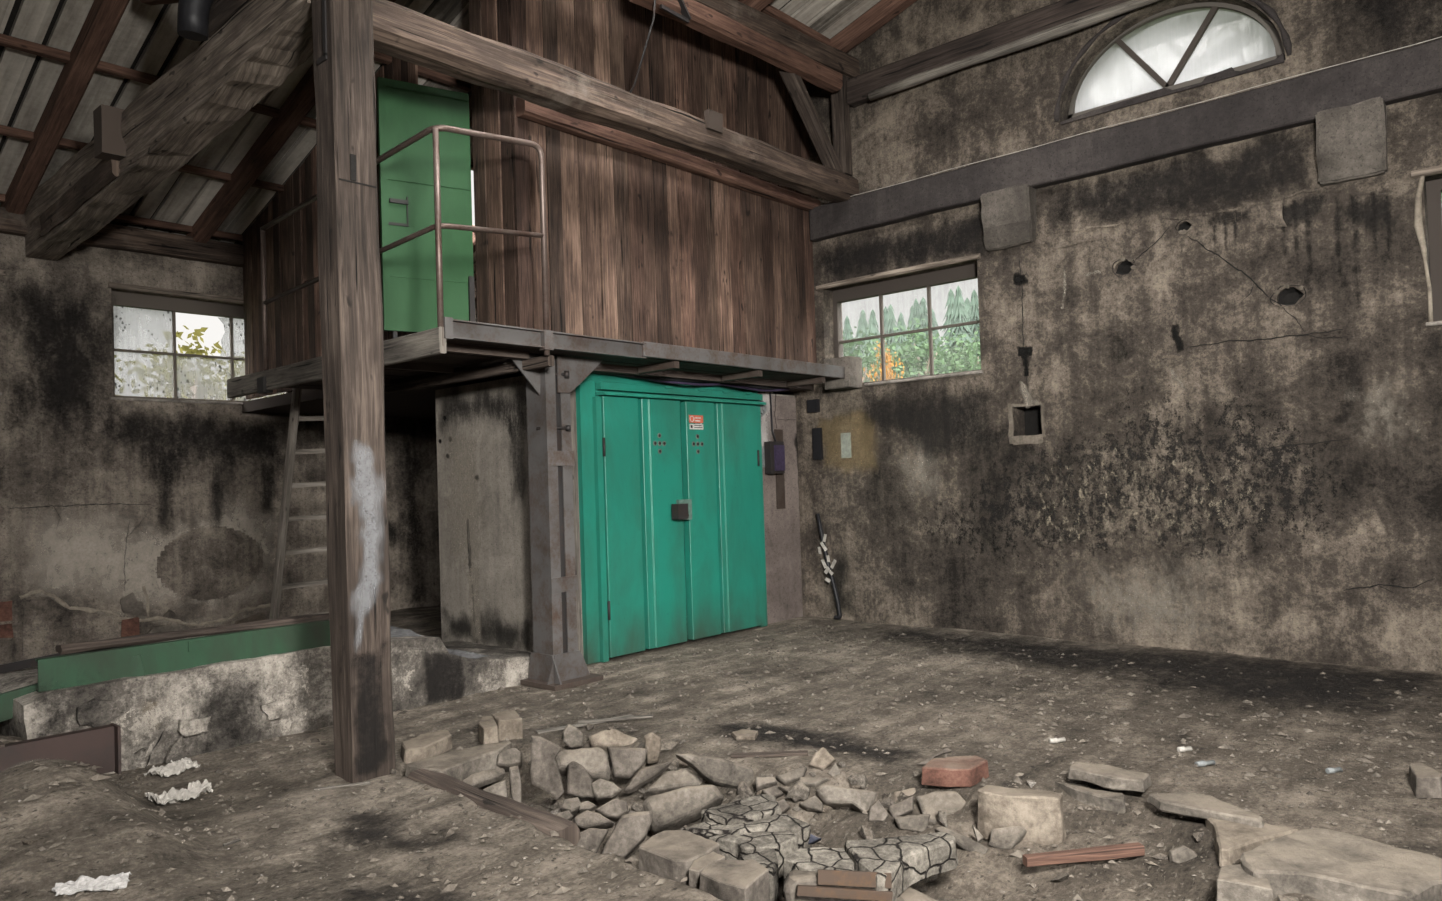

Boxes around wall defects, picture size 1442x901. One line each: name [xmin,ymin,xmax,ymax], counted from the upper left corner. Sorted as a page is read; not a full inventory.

spalling [1110,257,1138,280]
water stain [1058,132,1391,297]
crack [1131,229,1354,347]
spalling [1266,283,1310,308]
water stain [33,412,283,604]
water stain [821,392,990,488]
water stain [917,385,1368,579]
water stain [823,556,851,613]
water stain [884,630,1441,712]
spalling [463,724,1027,858]